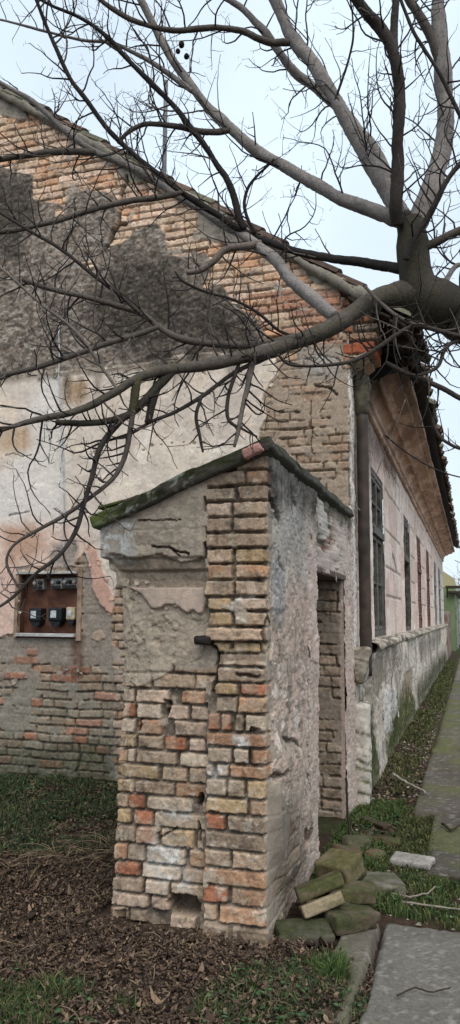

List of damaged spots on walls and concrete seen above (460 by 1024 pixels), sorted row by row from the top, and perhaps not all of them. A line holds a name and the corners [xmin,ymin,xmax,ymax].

flaking render [0,99,346,338]
spalling [86,544,207,615]
crack [136,518,190,558]
flaking render [262,332,350,663]
flaking render [0,666,121,785]